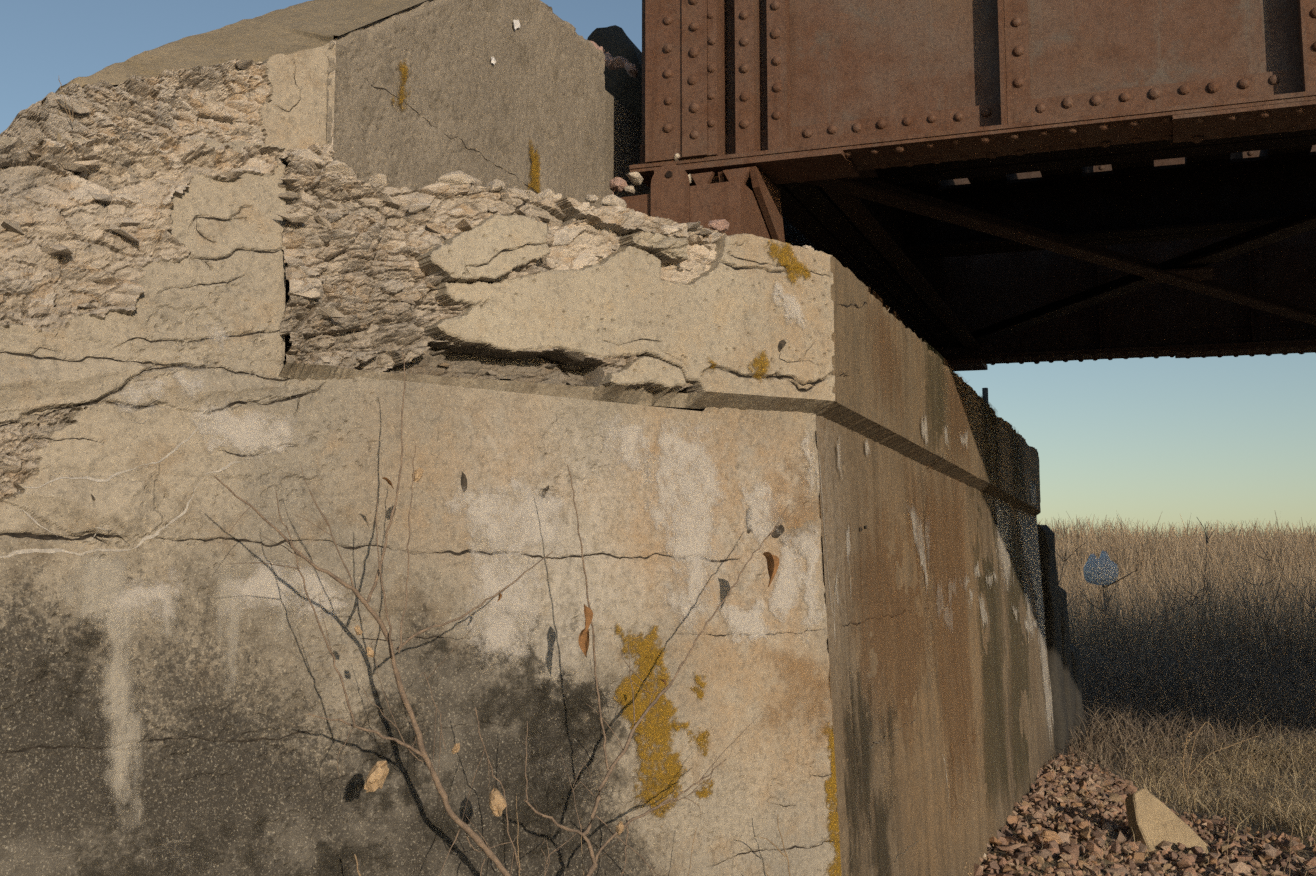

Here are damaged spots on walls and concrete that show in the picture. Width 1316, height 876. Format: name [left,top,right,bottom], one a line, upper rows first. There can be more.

crack [160,207,281,293]
spalling [0,59,727,393]
crack [468,243,544,272]
spalling [0,406,85,499]
crack [0,330,738,562]
crack [705,341,861,392]
water stain [910,482,1054,735]
water stain [844,672,891,876]